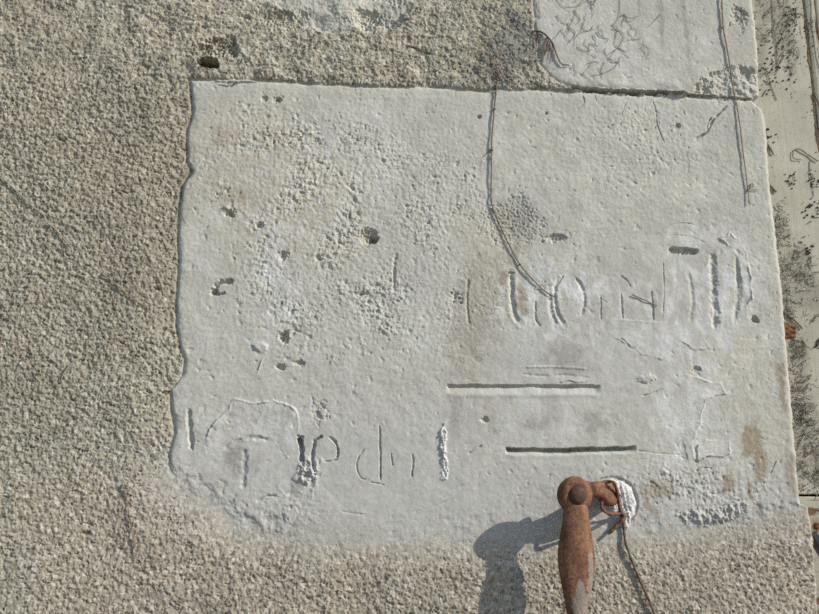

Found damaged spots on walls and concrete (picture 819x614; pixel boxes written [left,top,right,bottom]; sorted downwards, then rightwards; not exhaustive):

rust [743,427,766,497]